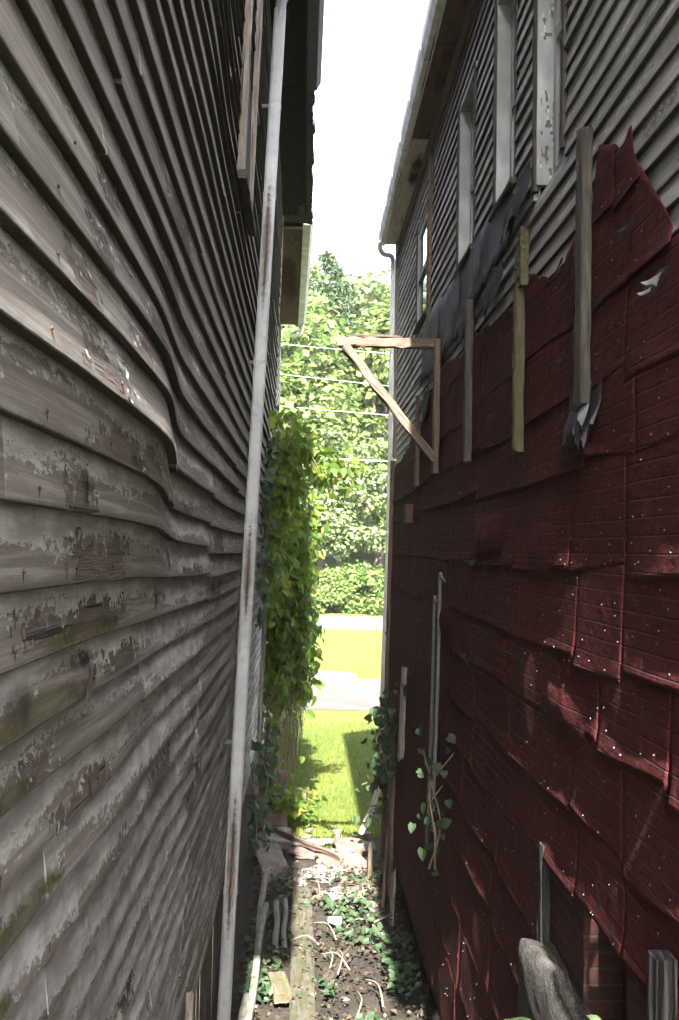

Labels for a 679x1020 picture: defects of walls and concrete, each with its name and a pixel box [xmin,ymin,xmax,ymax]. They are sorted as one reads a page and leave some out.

peeling [83,413,163,487]
peeling [63,463,102,516]
peeling [7,527,133,657]
peeling [100,636,142,680]
peeling [14,740,61,797]
peeling [46,756,113,837]
peeling [116,963,135,1020]